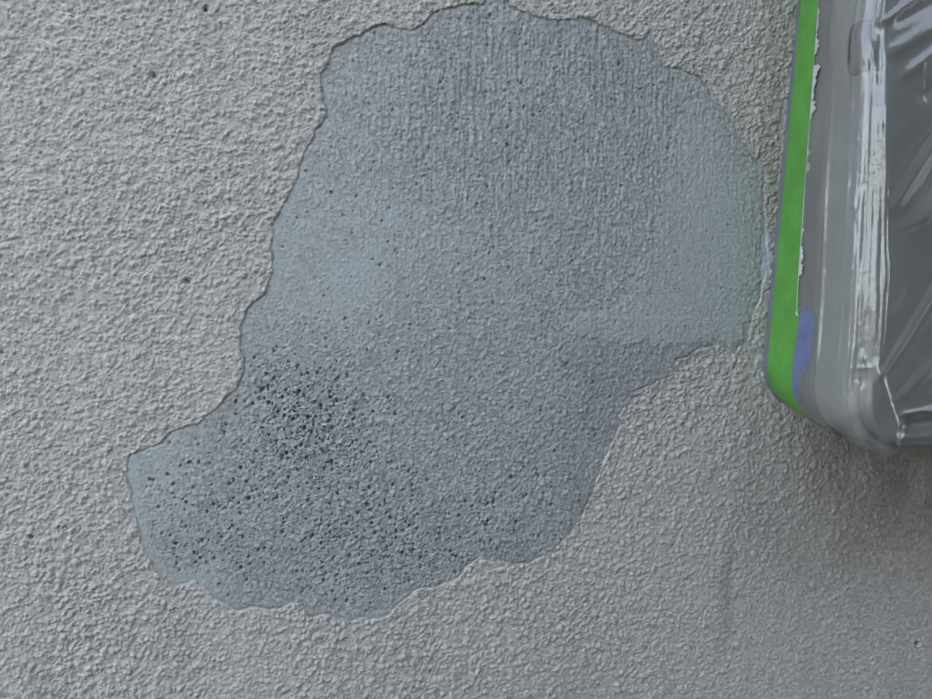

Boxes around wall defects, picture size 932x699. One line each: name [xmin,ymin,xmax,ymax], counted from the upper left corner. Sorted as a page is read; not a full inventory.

peeling [124,0,773,624]